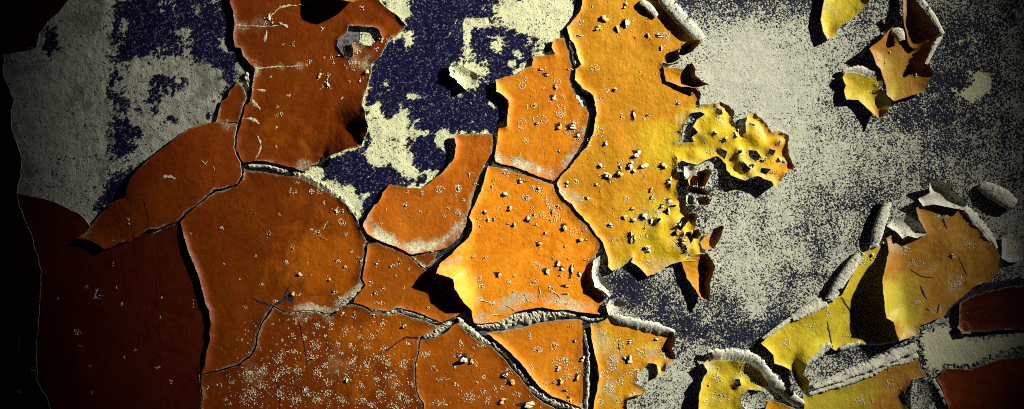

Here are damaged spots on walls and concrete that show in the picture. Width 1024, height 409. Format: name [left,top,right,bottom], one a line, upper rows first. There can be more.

peeling [3,0,255,249]
crack [144,28,609,409]
peeling [303,0,590,247]
peeling [579,0,1024,409]